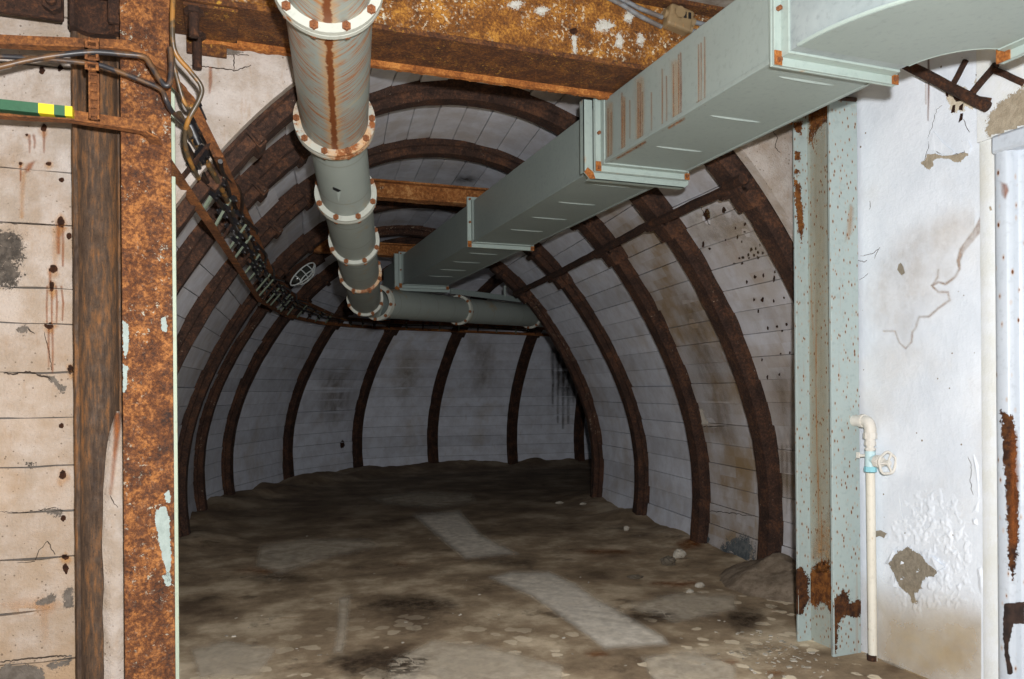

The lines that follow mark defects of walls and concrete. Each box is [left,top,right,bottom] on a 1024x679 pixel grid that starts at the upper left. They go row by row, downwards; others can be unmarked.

corrosion [202,39,291,57]
corrosion [370,59,613,100]
peeling [921,59,1024,170]
corrosion [789,106,827,244]
leakage [0,229,28,291]
corrosion [998,409,1020,581]
corrosion [796,544,861,654]
spalling [876,530,945,604]